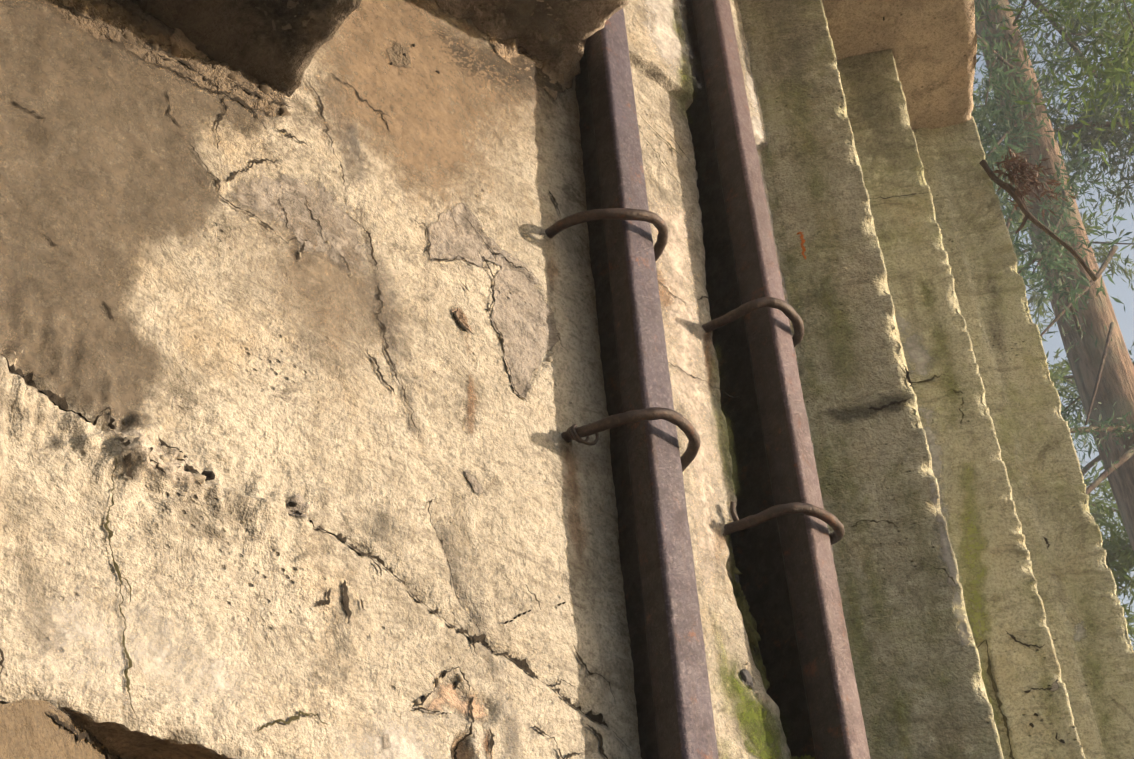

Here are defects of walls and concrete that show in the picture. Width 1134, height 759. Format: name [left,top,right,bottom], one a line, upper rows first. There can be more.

damp [250,0,324,54]
damp [0,0,282,428]
crack [166,66,419,438]
peeling [428,203,560,402]
crack [0,353,137,718]
crack [258,710,327,731]
spalling [412,666,488,759]
crack [292,495,628,759]